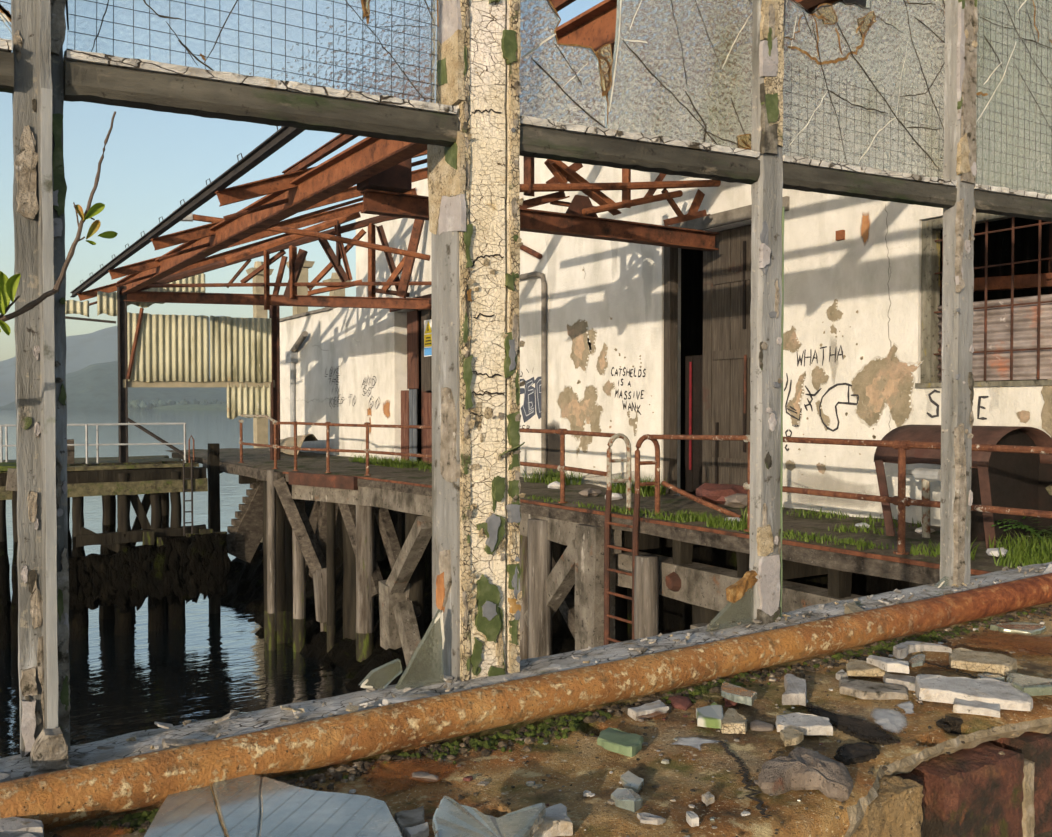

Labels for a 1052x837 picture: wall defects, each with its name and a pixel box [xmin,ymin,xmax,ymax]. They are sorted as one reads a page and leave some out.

crack [143,0,238,71]
crack [523,0,606,128]
crack [623,0,752,150]
crack [786,0,945,170]
peeling [820,298,851,347]
crack [470,371,504,417]
peeling [556,319,642,457]
peeling [845,343,923,439]
peeling [737,365,1052,635]
corrosion [966,632,1052,655]
corrosion [370,760,456,794]
corrosion [58,827,124,837]